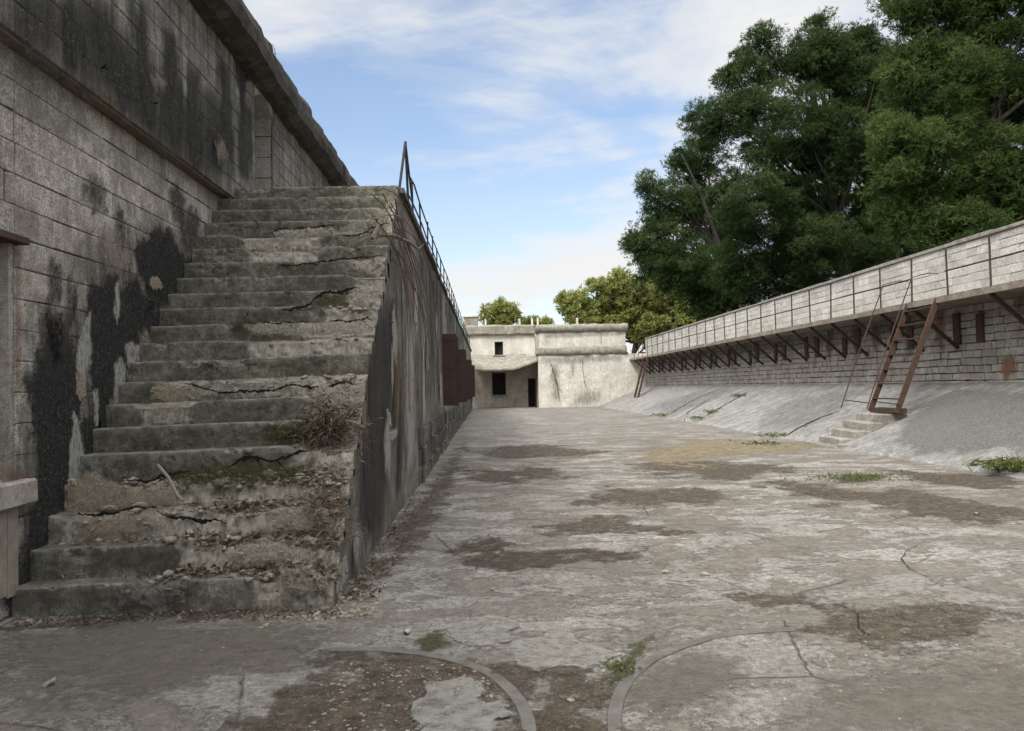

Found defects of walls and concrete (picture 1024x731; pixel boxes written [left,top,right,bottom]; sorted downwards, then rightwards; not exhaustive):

leakage [95,1,204,168]
leakage [221,59,246,157]
crack [242,287,372,325]
leakage [16,174,202,586]
crack [184,381,360,394]
rust [1001,355,1016,381]
crack [226,450,308,468]
crack [69,471,226,525]